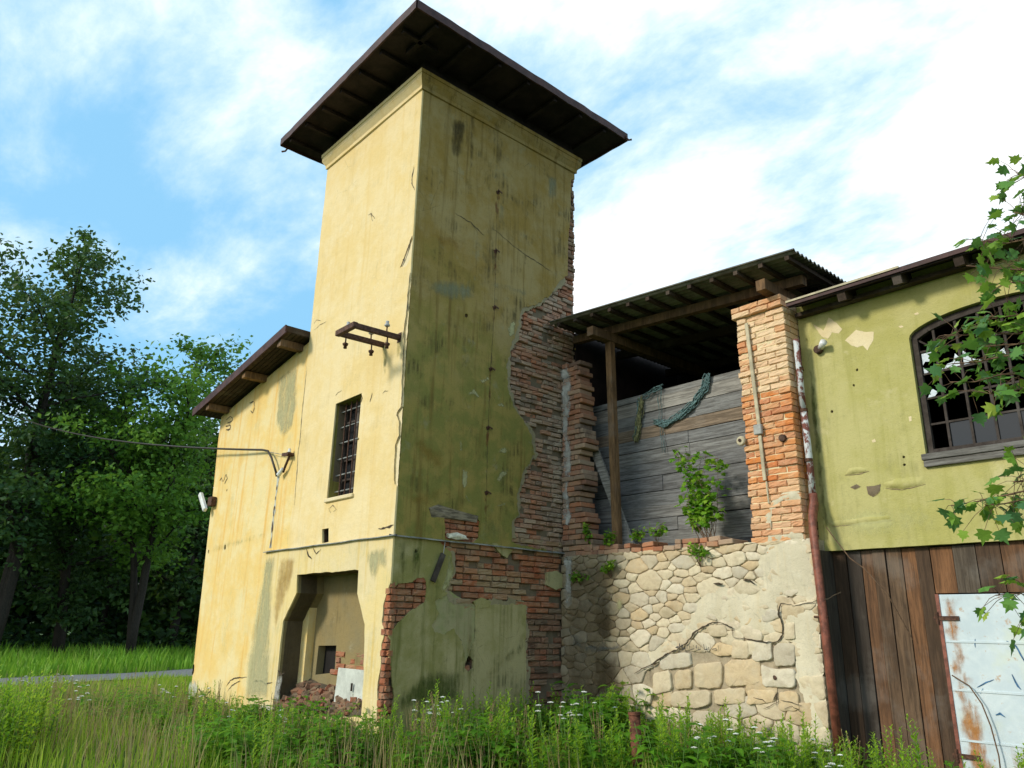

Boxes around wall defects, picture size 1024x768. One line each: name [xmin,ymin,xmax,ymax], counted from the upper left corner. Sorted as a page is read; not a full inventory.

peeling [813,318,874,350]
water stain [277,371,296,433]
spalling [377,180,575,719]
spalling [850,484,881,497]
water stain [247,562,272,695]
crack [636,592,841,673]
corrosion [963,711,990,768]